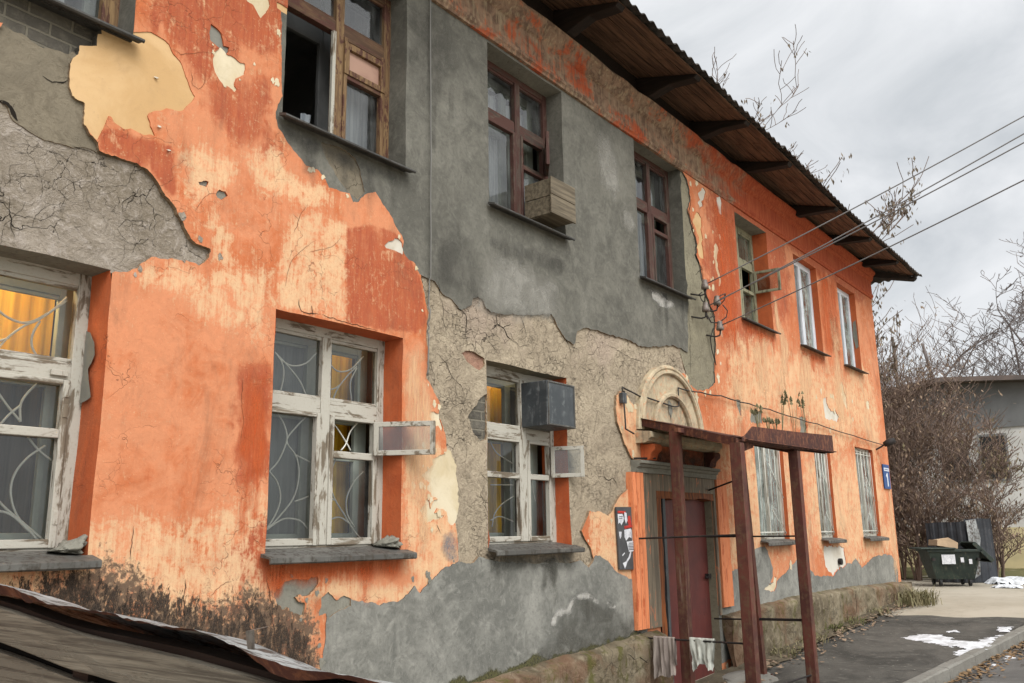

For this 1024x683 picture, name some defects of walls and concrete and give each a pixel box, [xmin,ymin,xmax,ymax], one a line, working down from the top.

peeling [209,24,256,92]
flaking render [0,0,223,277]
crack [2,142,152,263]
crack [439,287,636,433]
flaking render [380,171,723,606]
peeling [816,382,854,437]
water stain [5,569,313,666]
flaking render [274,574,351,669]
peeling [764,560,796,592]
peeling [816,545,876,576]